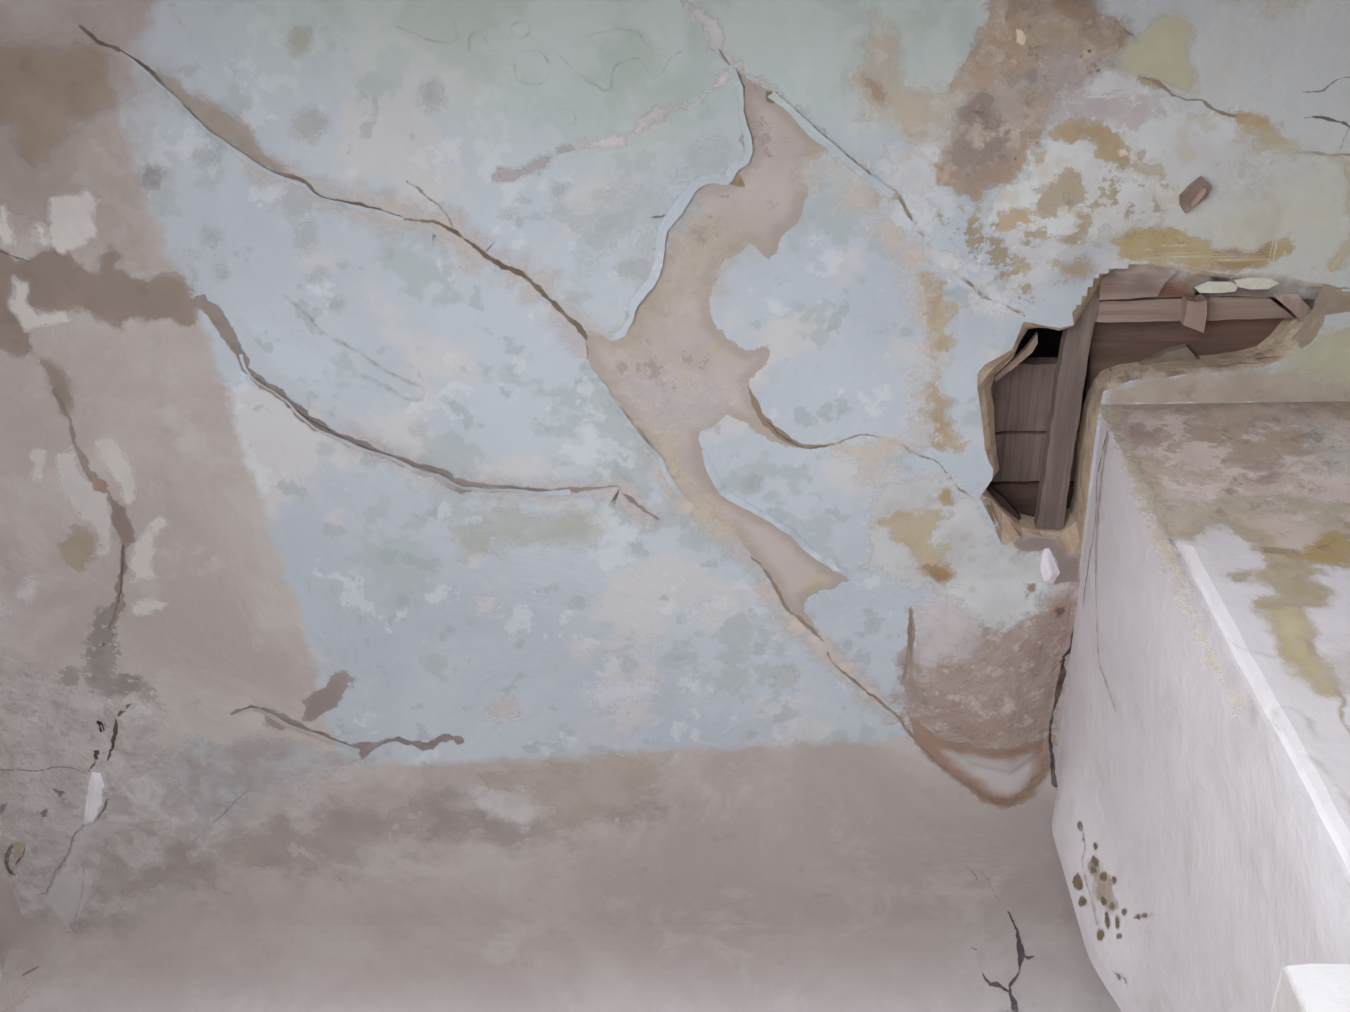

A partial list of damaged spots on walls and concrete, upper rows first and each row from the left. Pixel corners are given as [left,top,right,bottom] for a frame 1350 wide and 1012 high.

leakage [0,43,120,229]
leakage [0,231,198,416]
crack [79,25,589,357]
crack [194,294,658,520]
peeling [583,69,1108,762]
leakage [938,160,1350,302]
peeling [1194,277,1279,293]
flaking render [1292,285,1350,348]
crack [30,387,167,680]
leakage [1099,328,1350,732]
crack [972,911,1034,1012]
mould [1072,821,1147,941]